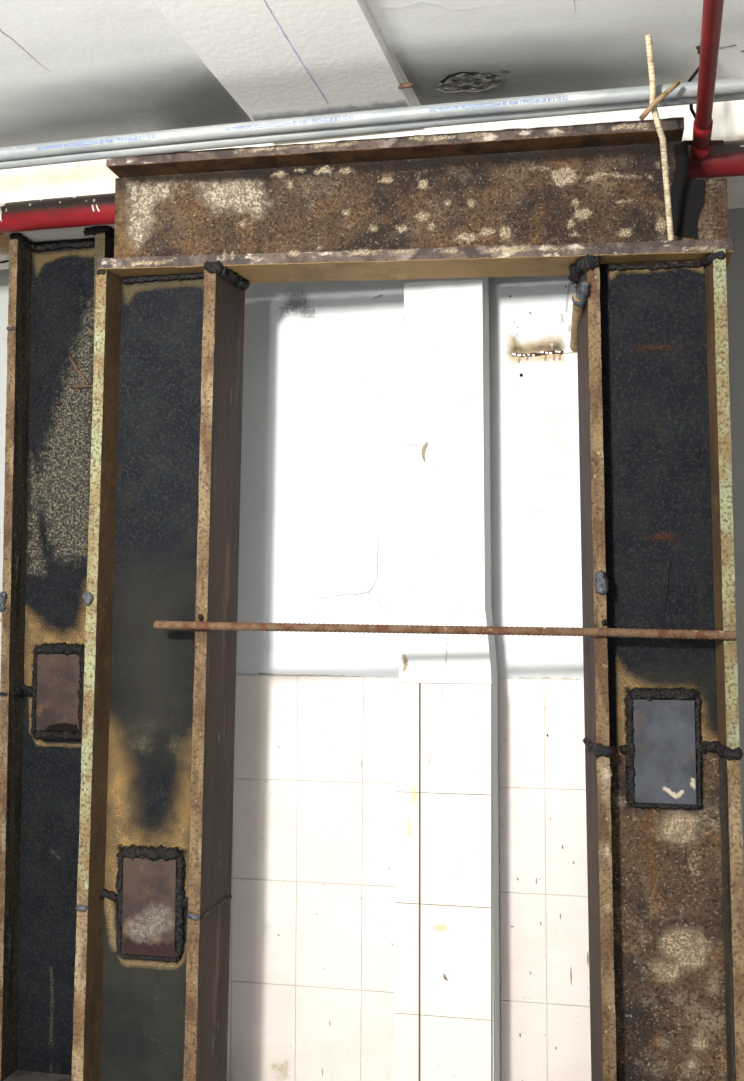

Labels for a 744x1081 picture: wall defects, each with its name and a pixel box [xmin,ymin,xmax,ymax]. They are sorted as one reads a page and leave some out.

crack [308,529,403,617]
leakage [105,743,190,969]